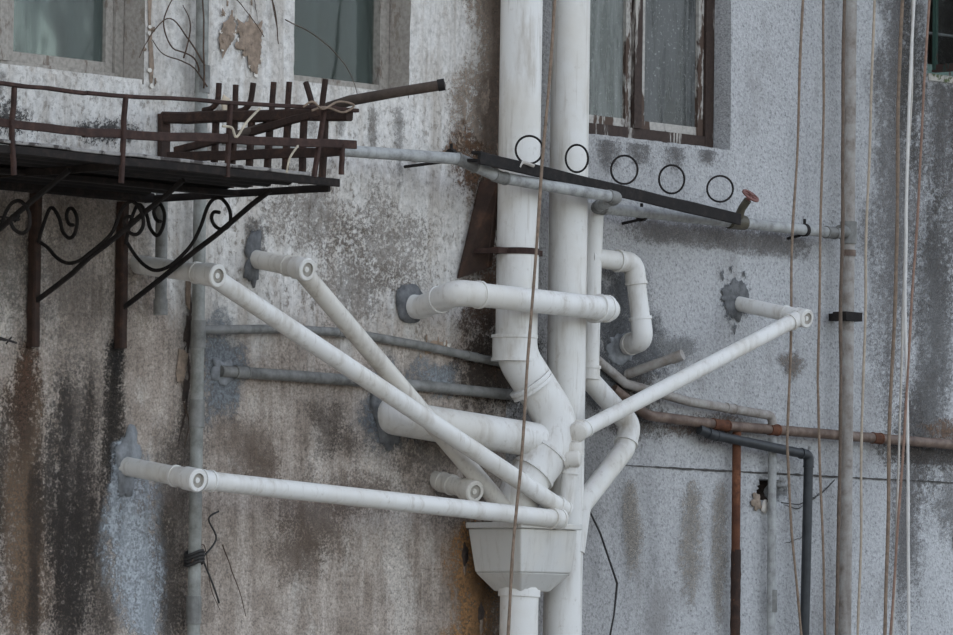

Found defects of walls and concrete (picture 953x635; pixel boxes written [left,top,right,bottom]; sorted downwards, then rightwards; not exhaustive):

peeling [219,0,263,77]
leakage [448,0,501,156]
leakage [100,340,125,505]